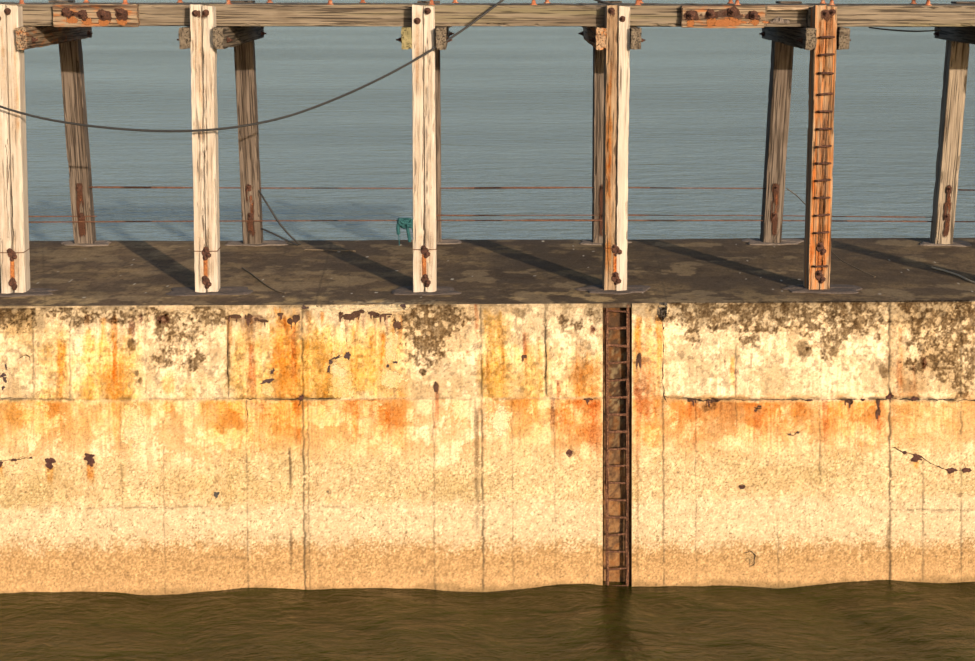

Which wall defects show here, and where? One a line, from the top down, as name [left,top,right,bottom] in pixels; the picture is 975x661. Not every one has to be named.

water stain [0,308,36,333]
rust [228,313,300,329]
rust [339,309,401,332]
water stain [47,306,226,371]
water stain [394,304,476,375]
water stain [651,300,975,396]
crack [0,457,56,470]
crack [83,453,95,467]
crack [891,447,972,474]